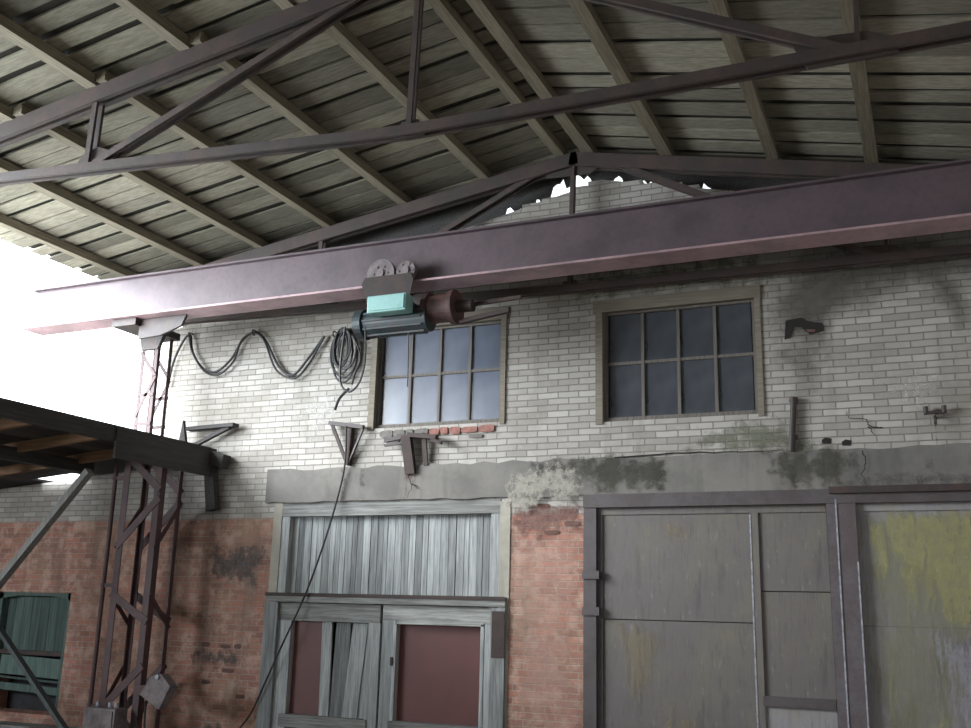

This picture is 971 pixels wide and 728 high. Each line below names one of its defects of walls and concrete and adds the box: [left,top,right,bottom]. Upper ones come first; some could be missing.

damp [783,248,971,329]
spalling [379,424,495,444]
damp [537,454,664,492]
damp [702,428,850,487]
damp [212,547,266,585]